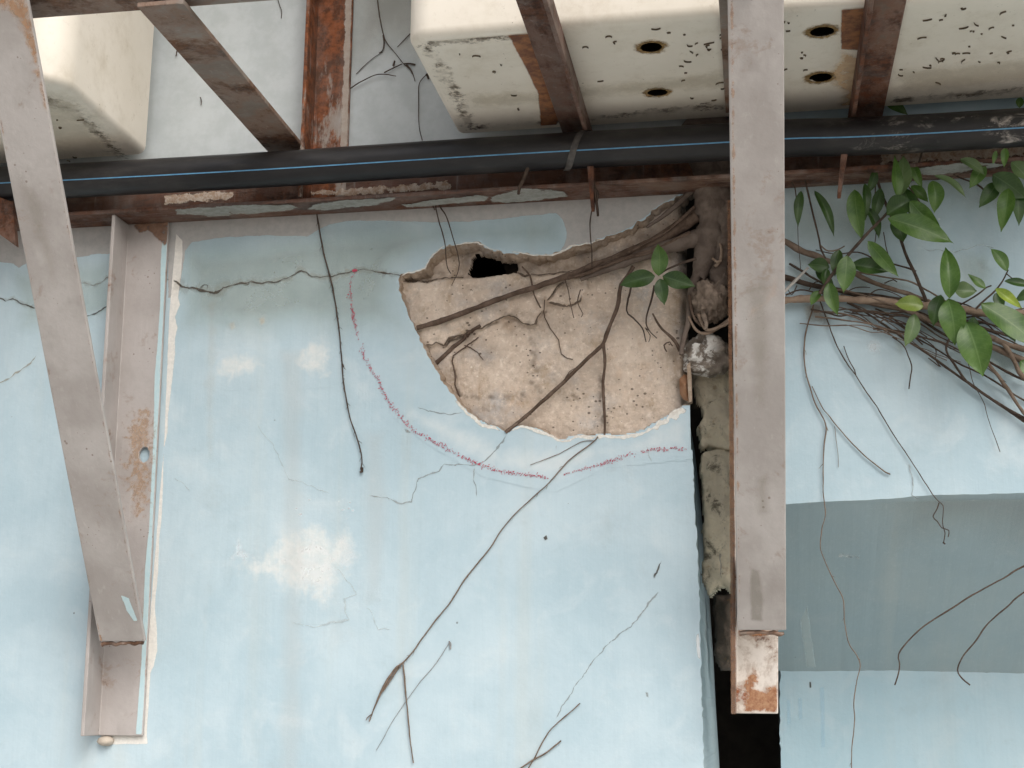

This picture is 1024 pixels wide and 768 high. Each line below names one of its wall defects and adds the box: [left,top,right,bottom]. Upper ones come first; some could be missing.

rust [841,8,864,50]
crack [174,269,400,294]
flaking render [168,194,694,442]
rust [727,200,777,714]